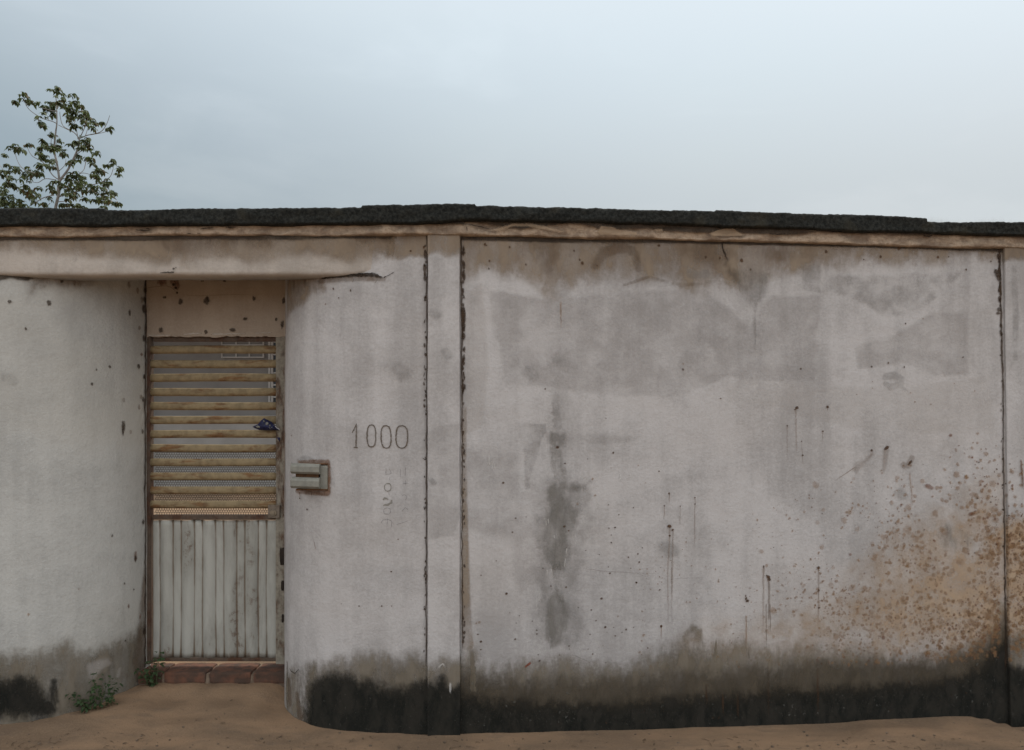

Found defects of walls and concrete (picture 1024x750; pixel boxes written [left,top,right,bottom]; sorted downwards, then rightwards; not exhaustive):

crack [322,272,394,280]
water stain [0,234,1024,736]